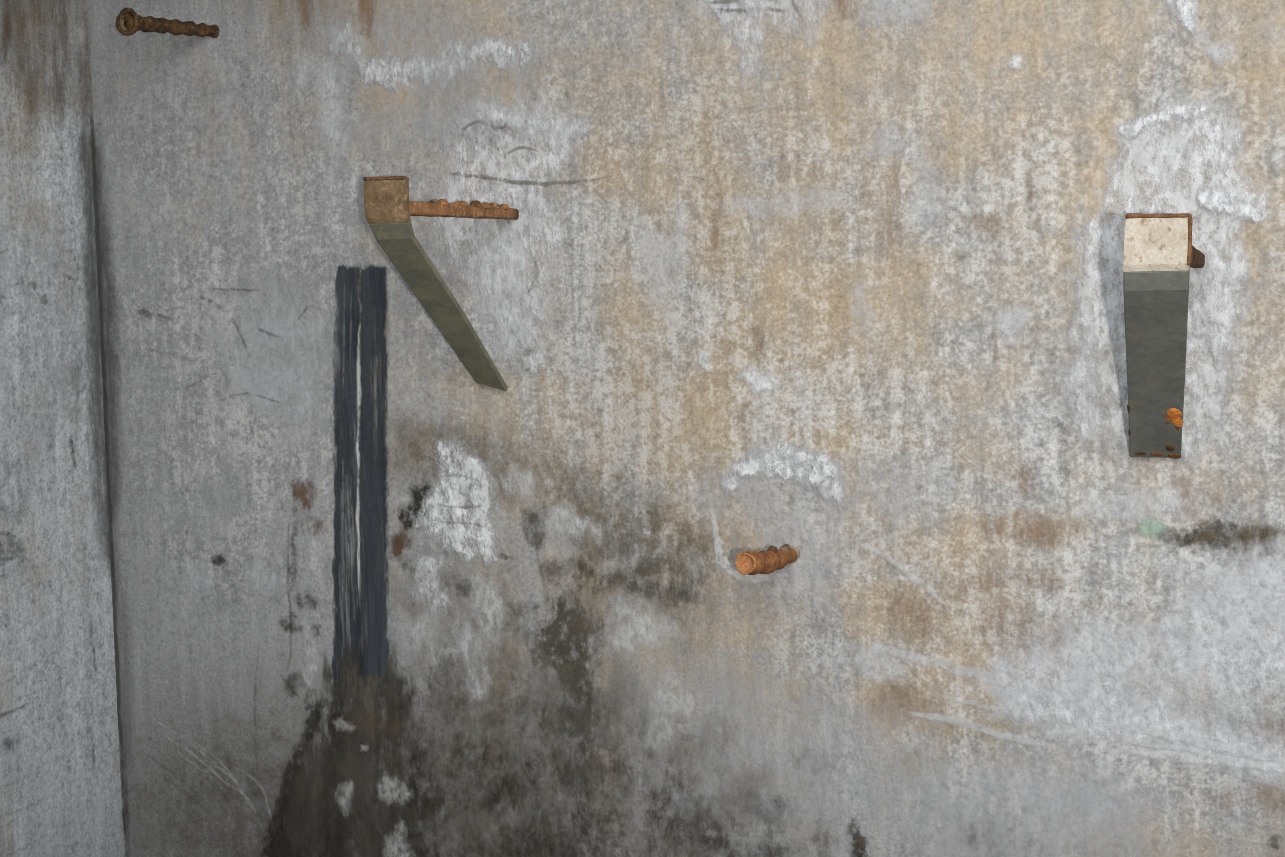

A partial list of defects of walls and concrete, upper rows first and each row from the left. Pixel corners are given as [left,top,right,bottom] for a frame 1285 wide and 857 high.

rust [360,0,373,34]
rust [428,199,509,209]
water stain [399,486,430,530]
water stain [524,513,545,548]
rust [767,544,800,557]
water stain [579,563,660,589]
water stain [531,591,616,857]
water stain [263,653,536,857]
water stain [849,821,866,857]